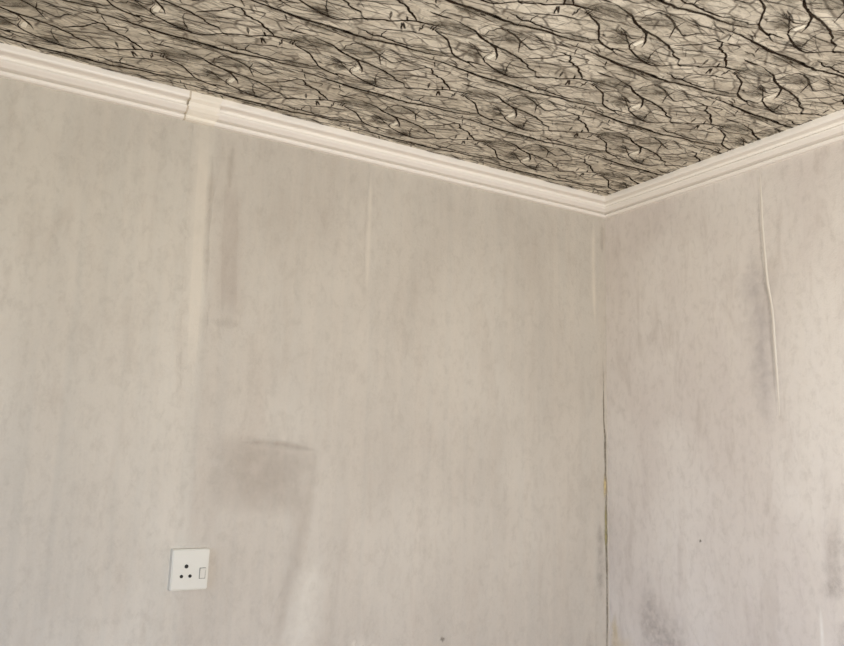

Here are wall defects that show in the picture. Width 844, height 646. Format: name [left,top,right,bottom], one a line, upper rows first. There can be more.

crack [185,91,223,127]